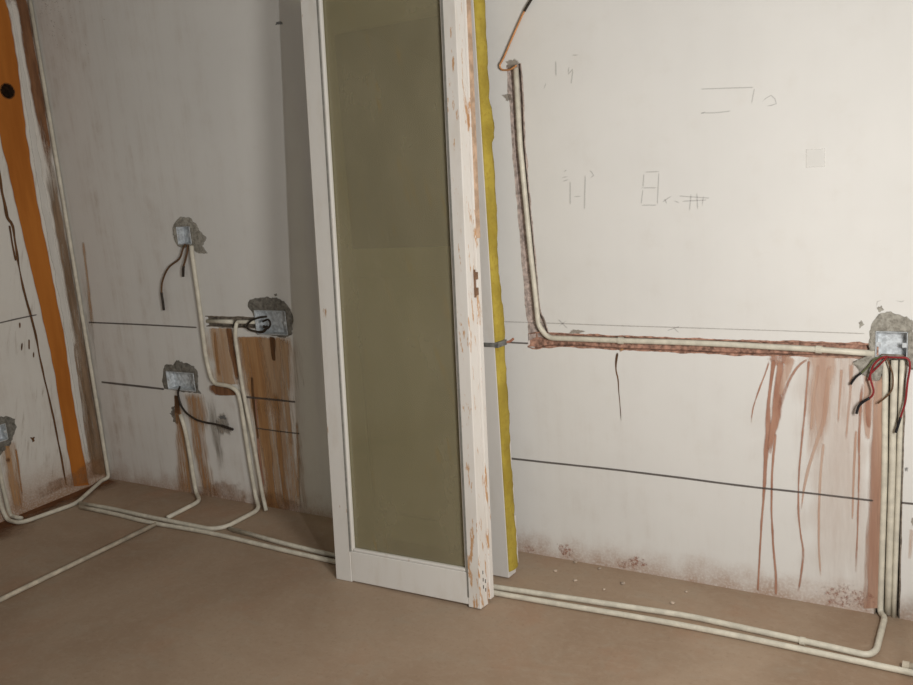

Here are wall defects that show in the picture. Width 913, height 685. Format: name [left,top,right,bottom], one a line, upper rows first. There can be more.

corrosion [0,0,113,535]
corrosion [174,395,219,495]
corrosion [209,328,299,509]
crack [615,349,623,416]
corrosion [751,355,882,609]